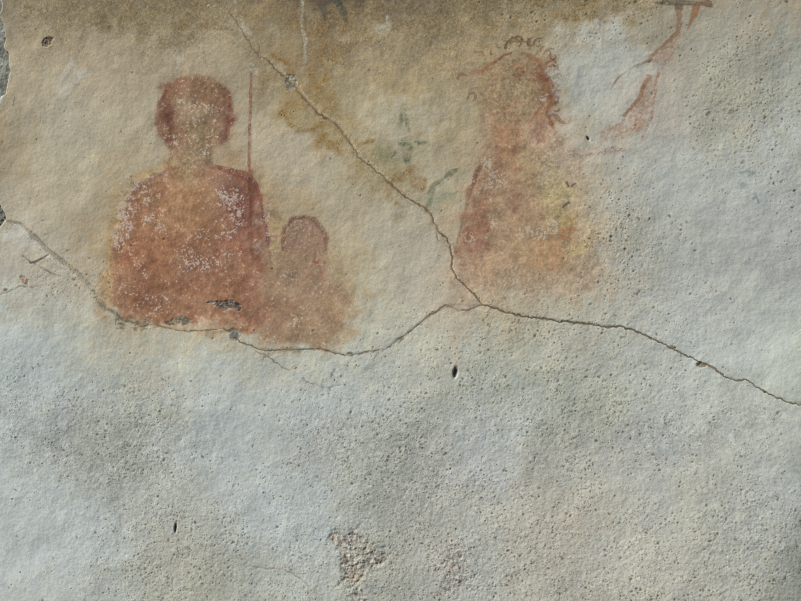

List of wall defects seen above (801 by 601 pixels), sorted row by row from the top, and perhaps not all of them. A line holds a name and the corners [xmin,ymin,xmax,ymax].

flaking render [0,22,11,106]
crack [0,0,801,406]